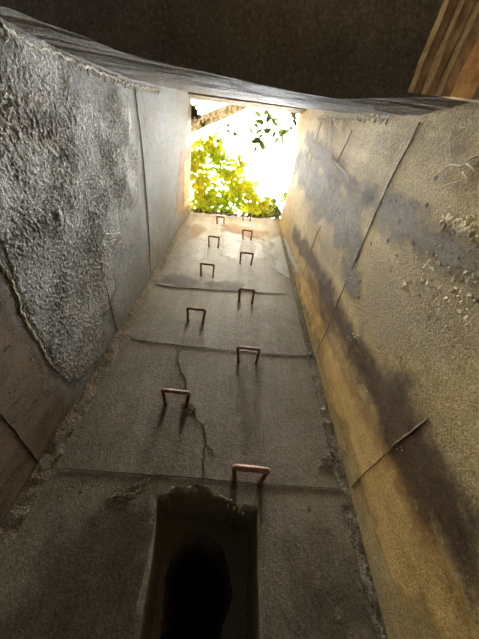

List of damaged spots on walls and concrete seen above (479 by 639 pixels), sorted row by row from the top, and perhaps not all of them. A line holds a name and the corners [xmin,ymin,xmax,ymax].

spalling [0,33,159,382]
peeling [434,212,479,252]
peeling [402,251,479,327]
leakage [270,226,479,585]
crack [62,408,325,488]